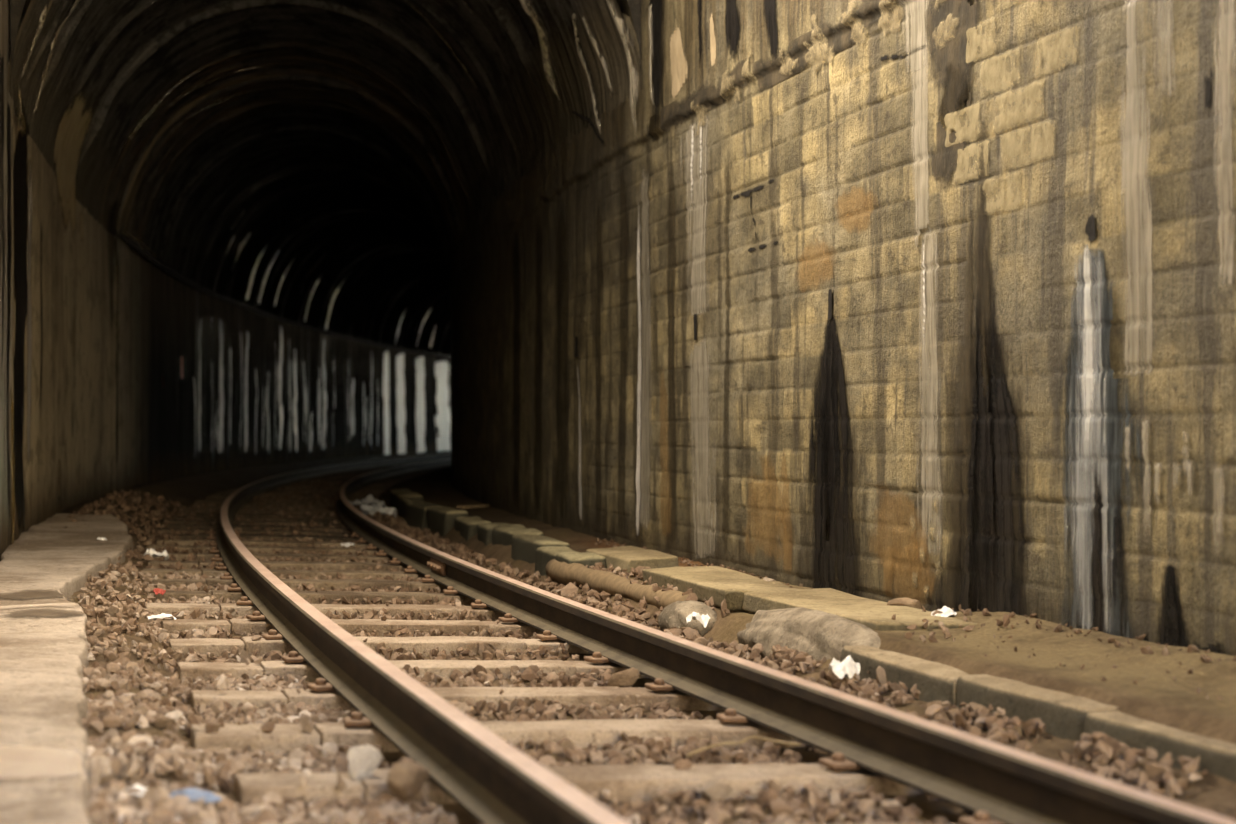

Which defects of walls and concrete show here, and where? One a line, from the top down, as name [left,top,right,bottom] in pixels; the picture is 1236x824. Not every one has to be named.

water stain [520,0,561,102]
water stain [572,13,612,134]
water stain [606,0,664,134]
water stain [725,0,740,58]
water stain [1214,0,1236,285]
water stain [899,0,1026,616]
water stain [1063,0,1174,639]
water stain [805,289,866,596]
water stain [1156,565,1231,656]